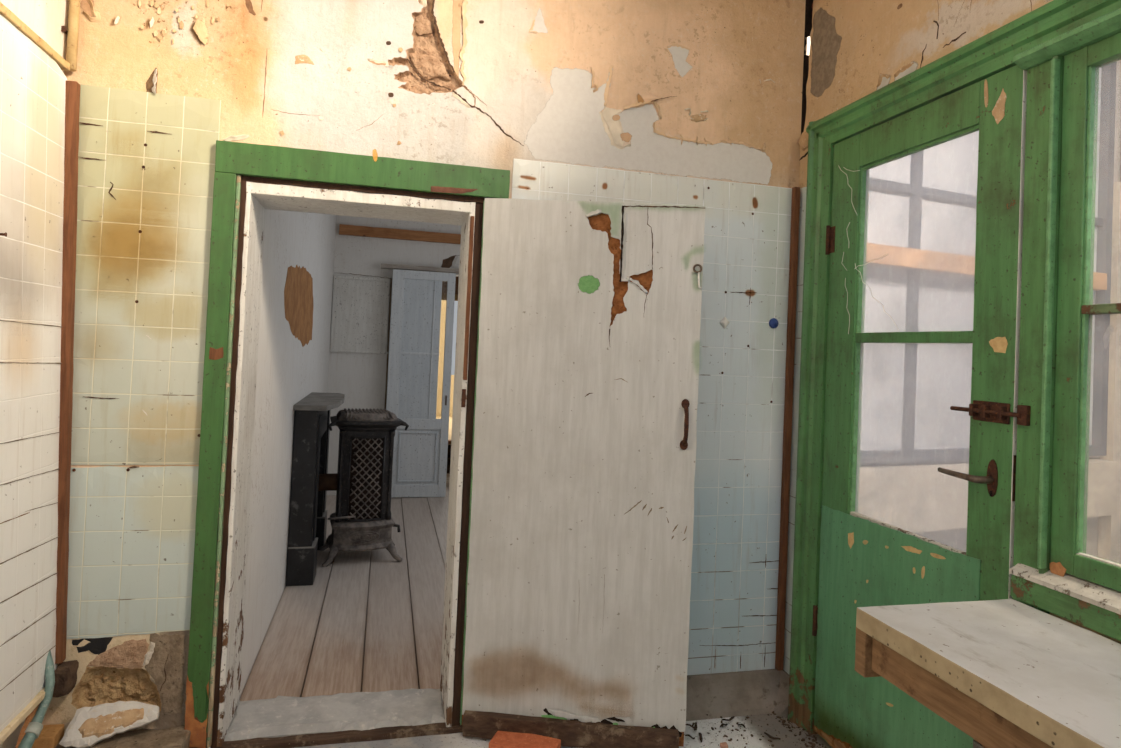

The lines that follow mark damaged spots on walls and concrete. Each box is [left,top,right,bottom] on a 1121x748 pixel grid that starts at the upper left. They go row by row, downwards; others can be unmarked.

peeling [81,0,120,25]
peeling [191,20,209,45]
spalling [367,0,484,104]
spalling [811,8,842,97]
crack [448,64,524,146]
peeling [524,65,772,185]
spalling [71,633,209,748]